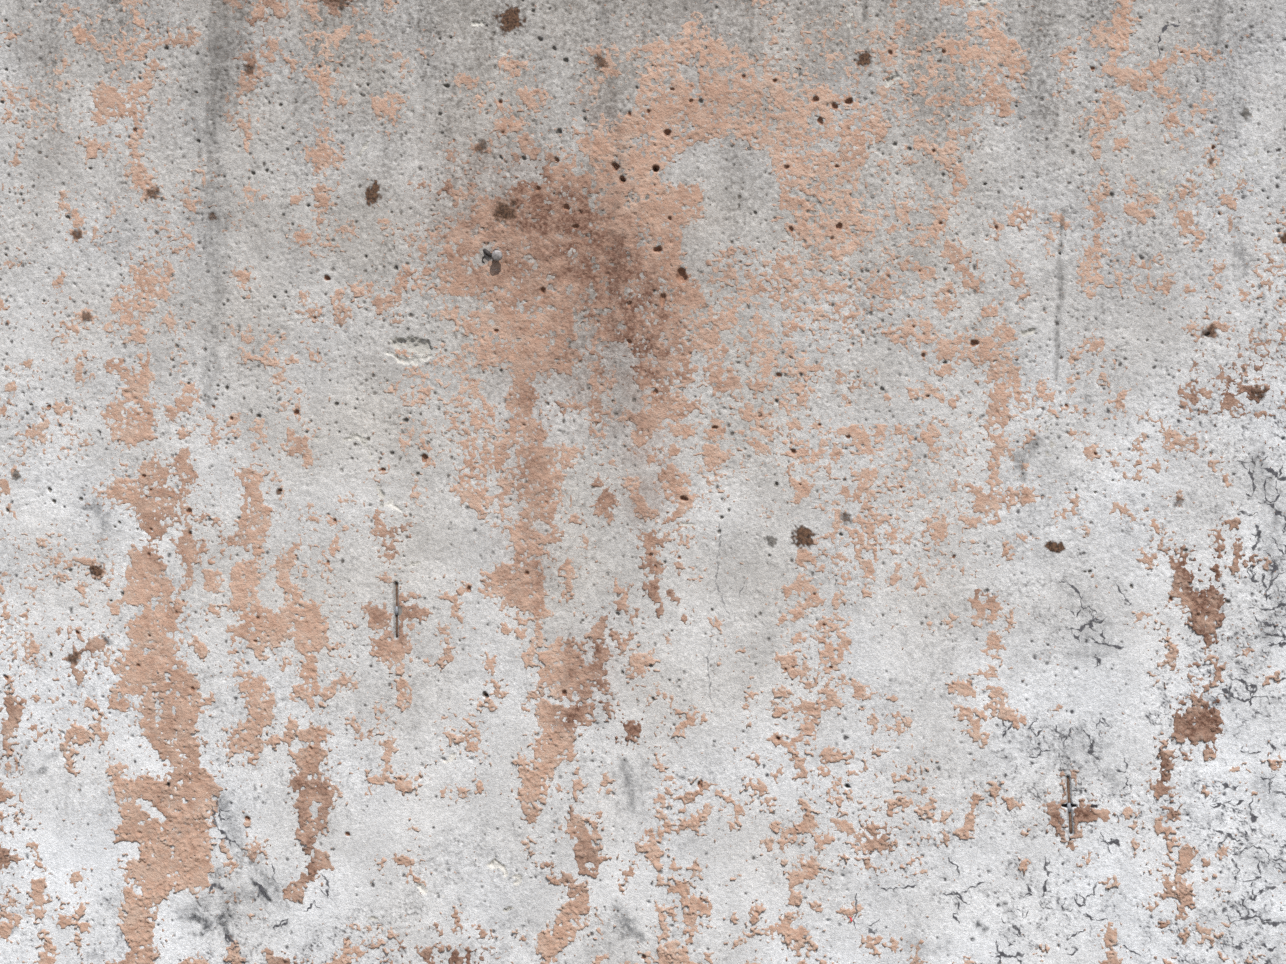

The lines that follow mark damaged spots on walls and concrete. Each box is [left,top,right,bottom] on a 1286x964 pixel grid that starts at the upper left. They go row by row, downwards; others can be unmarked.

rust [493,200,516,223]
rust [791,525,815,548]
crack [1218,456,1286,706]
crack [1061,581,1131,668]
crack [1002,717,1129,789]
peeling [369,818,457,896]
crack [853,857,984,934]
crack [991,832,1120,964]
crack [1210,743,1286,964]
peeling [178,935,316,964]